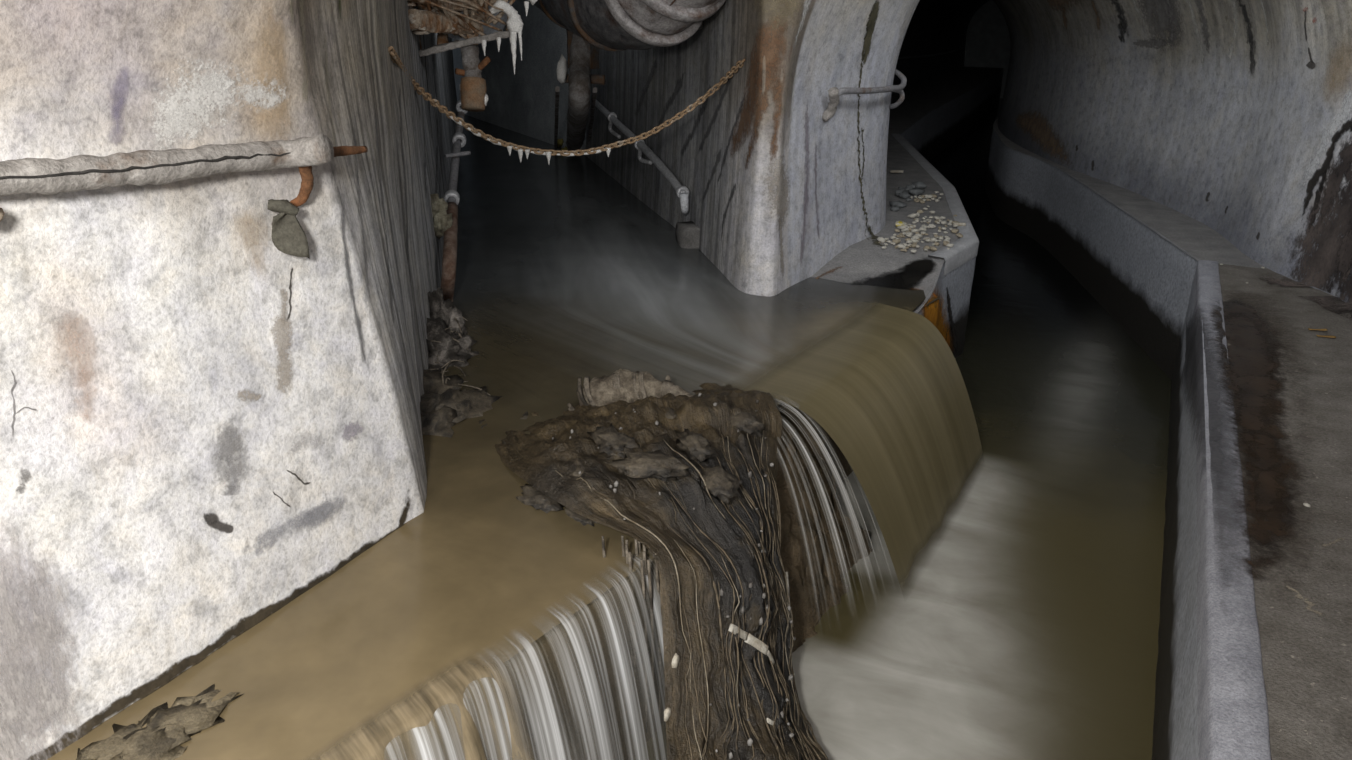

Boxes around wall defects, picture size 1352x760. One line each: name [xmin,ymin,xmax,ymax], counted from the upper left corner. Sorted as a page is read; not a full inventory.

water stain [1304,11,1315,69]
corrosion [731,16,786,167]
water stain [1303,92,1352,186]
corrosion [923,290,951,348]